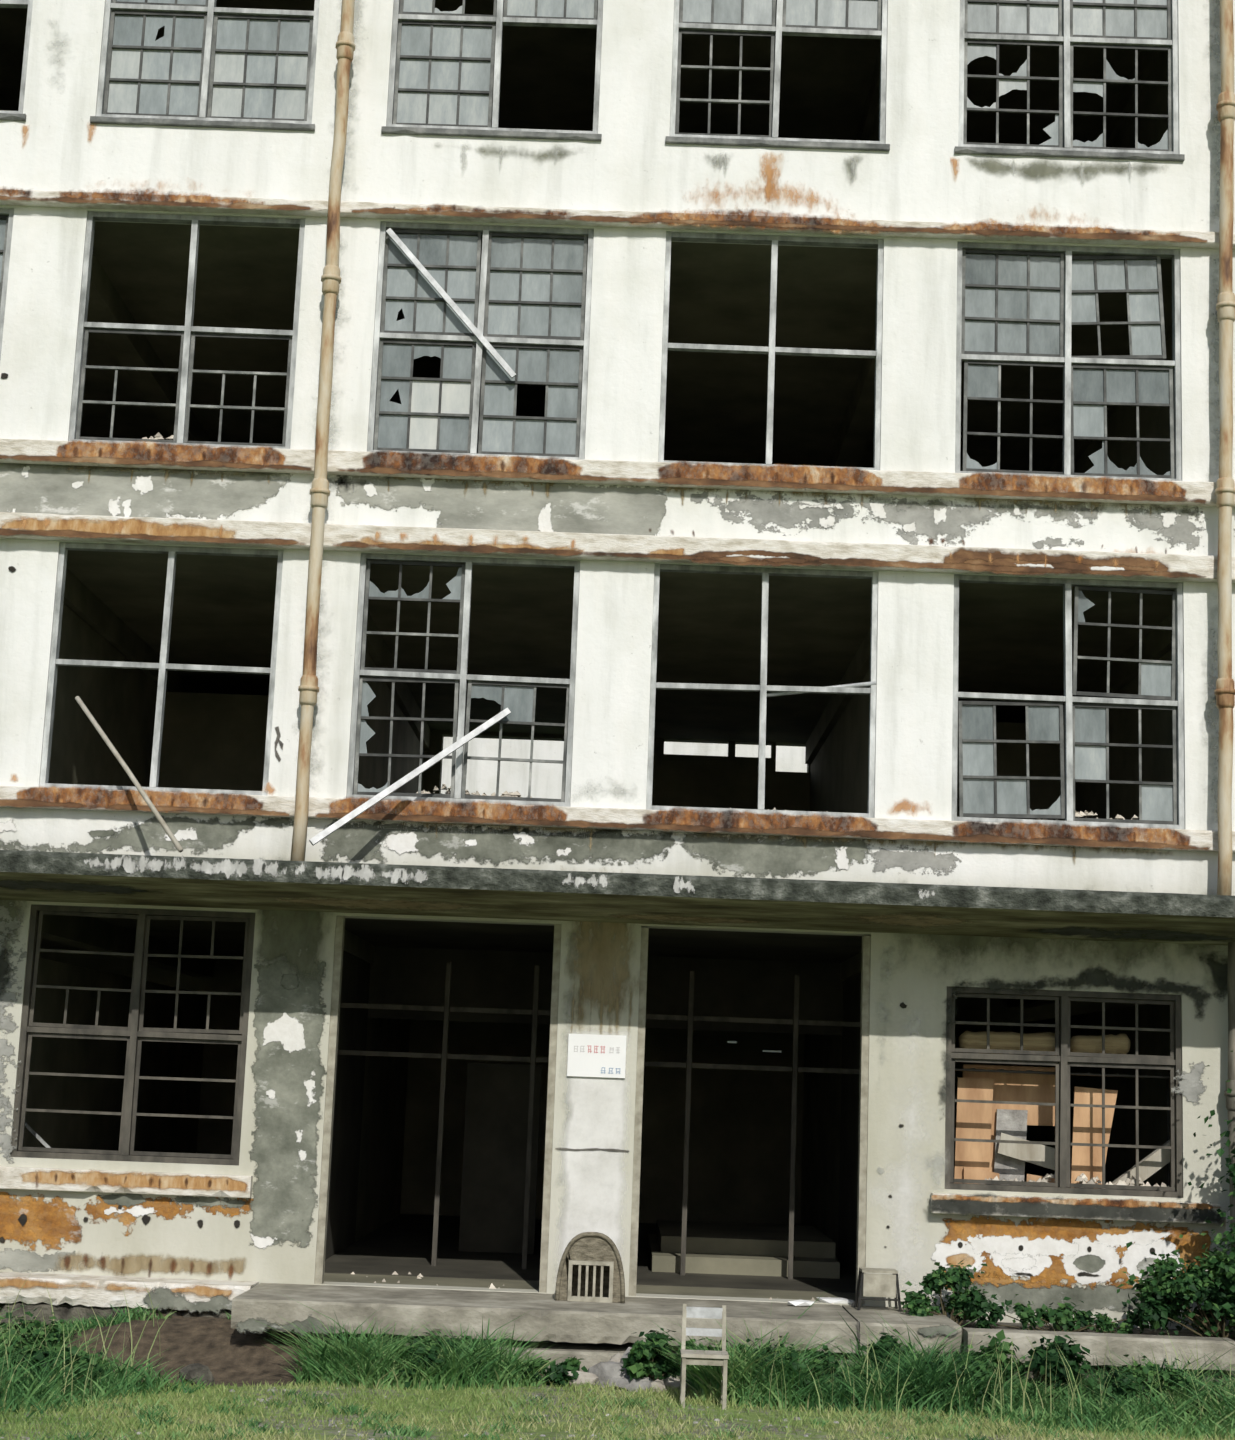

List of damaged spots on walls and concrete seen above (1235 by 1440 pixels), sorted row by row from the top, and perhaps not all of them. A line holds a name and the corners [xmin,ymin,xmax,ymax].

corrosion [0,188,311,210]
corrosion [352,157,1207,242]
peeling [0,463,293,519]
corrosion [0,441,311,482]
peeling [336,475,1156,575]
corrosion [0,775,289,816]
peeling [0,816,962,899]
damp [0,880,148,996]
damp [567,914,757,1041]
damp [859,914,1235,1102]
peeling [0,957,327,1251]
spalling [940,1215,1212,1313]